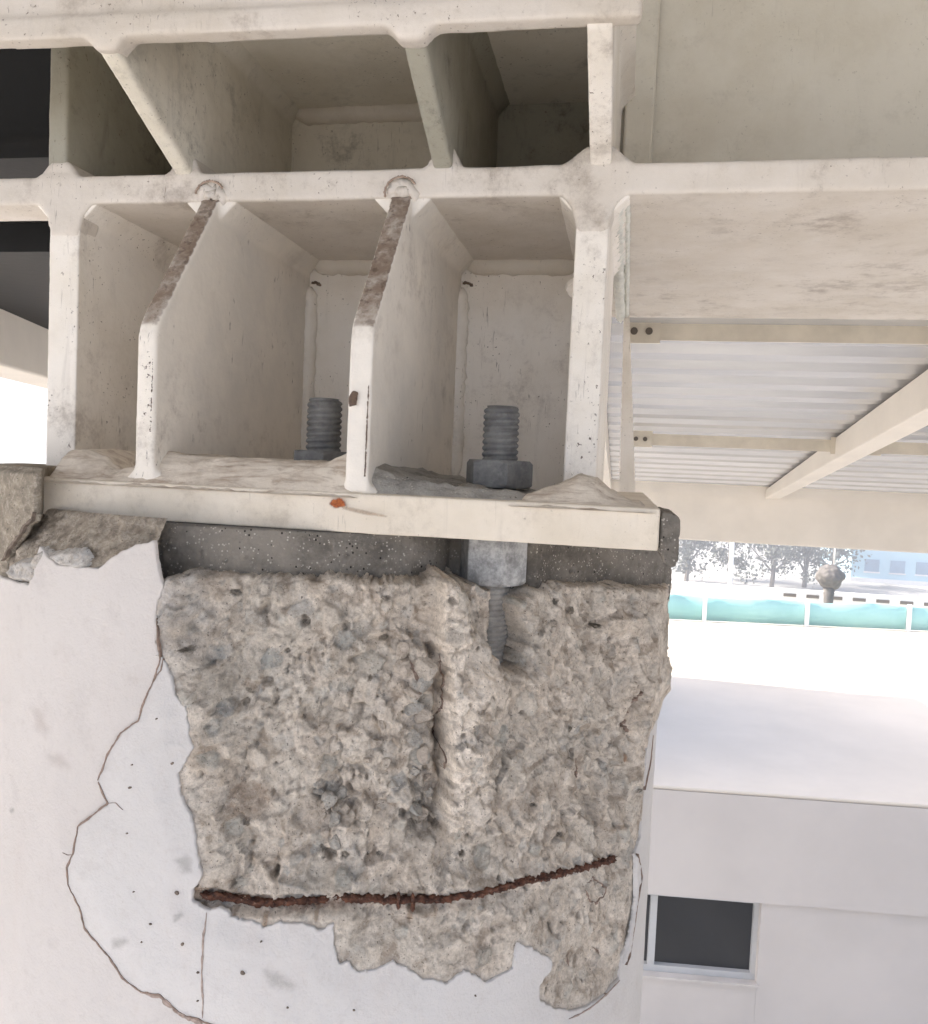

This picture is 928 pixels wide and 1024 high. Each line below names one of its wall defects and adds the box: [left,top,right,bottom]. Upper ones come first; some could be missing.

spalling [6,508,168,583]
rust [330,498,371,514]
crack [63,618,211,1024]
spalling [156,564,673,1010]